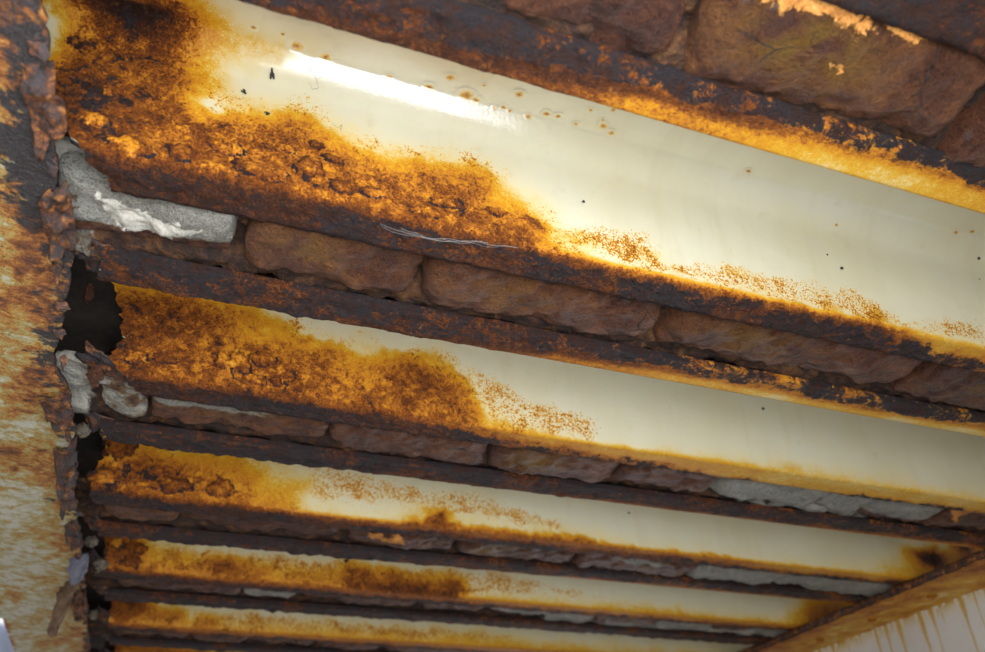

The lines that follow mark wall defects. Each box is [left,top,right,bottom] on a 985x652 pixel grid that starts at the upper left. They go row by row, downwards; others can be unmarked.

rust [42,0,985,373]
rust [0,0,91,652]
rust [87,418,985,586]
rust [93,520,985,652]
rust [94,245,985,514]